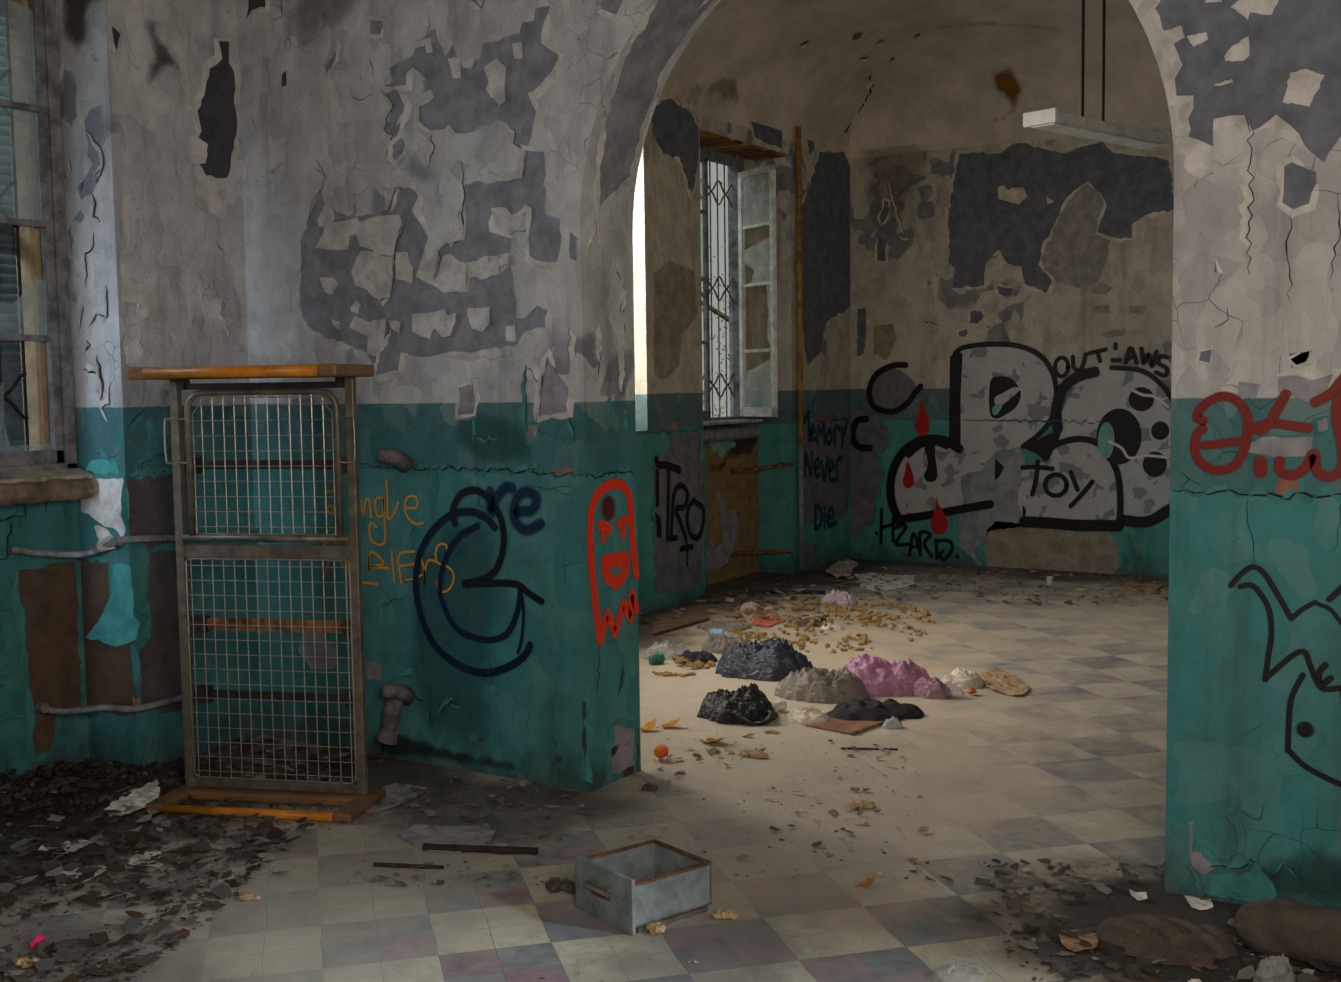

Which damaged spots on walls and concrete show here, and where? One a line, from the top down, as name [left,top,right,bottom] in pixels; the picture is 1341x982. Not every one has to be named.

peeling [110,25,123,53]
peeling [185,38,240,178]
peeling [247,0,270,17]
peeling [593,0,718,213]
peeling [748,118,784,152]
corrosion [995,72,1020,105]
peeling [945,0,1341,313]
peeling [296,6,577,448]
peeling [802,139,897,366]
peeling [957,308,985,338]
crack [1173,471,1341,561]
peeling [7,459,195,777]